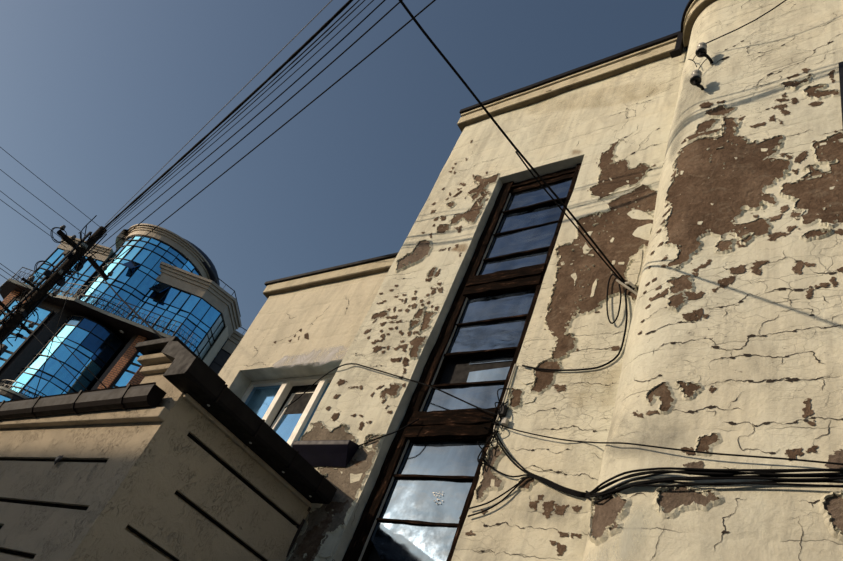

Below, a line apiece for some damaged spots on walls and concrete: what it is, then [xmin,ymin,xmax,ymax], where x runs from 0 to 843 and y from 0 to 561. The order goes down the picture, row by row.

crack [712,4,841,94]
peeling [395,171,500,273]
peeling [508,68,843,410]
peeling [287,379,386,561]
peeling [363,266,443,413]
crack [483,514,557,530]
crack [511,408,609,480]
flaking render [517,476,632,556]
peeling [633,380,717,418]
flaking render [653,483,725,519]
crack [714,498,746,550]
crack [645,251,843,469]